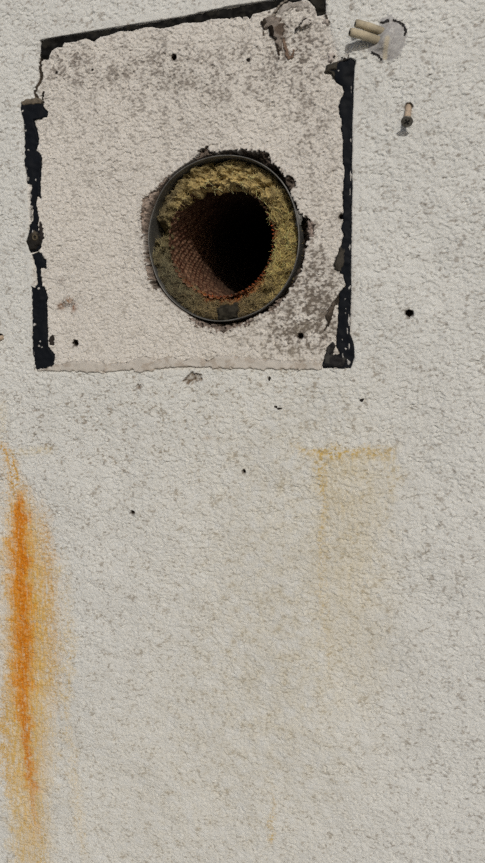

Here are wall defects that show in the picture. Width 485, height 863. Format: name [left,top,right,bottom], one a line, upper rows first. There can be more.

peeling [260,0,330,60]
corrosion [0,389,91,863]